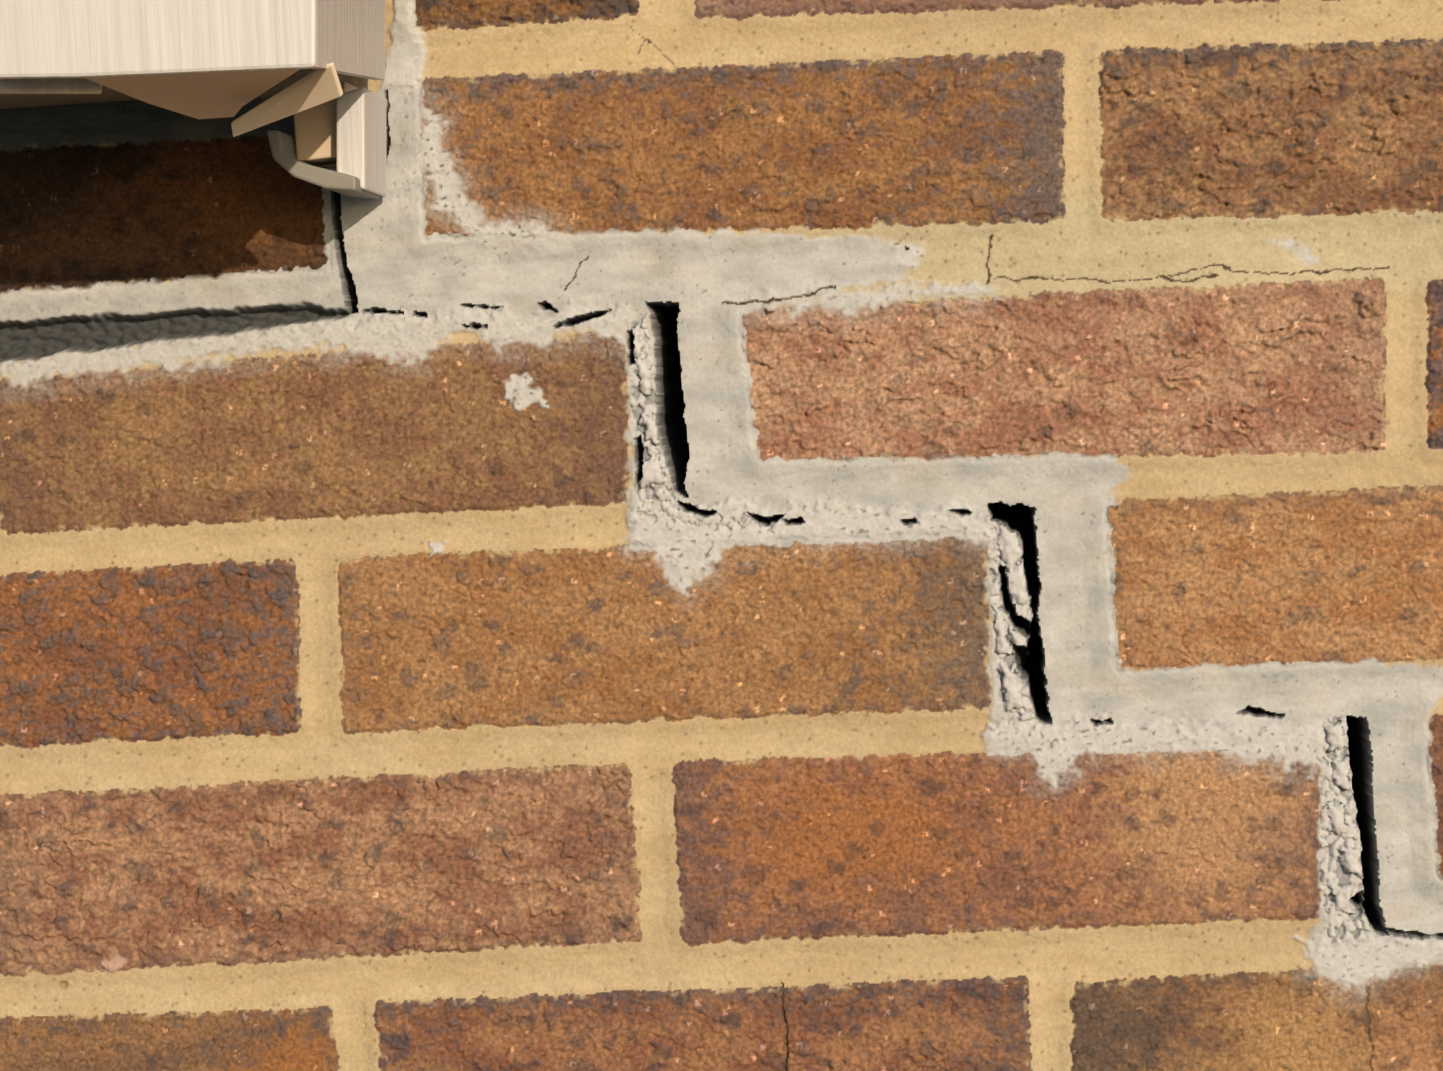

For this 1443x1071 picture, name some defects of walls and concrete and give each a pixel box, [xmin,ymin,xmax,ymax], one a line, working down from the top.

crack [984,234,1390,285]
crack [899,501,1053,725]
crack [1090,717,1114,727]
crack [1236,704,1286,720]
crack [1346,715,1443,941]